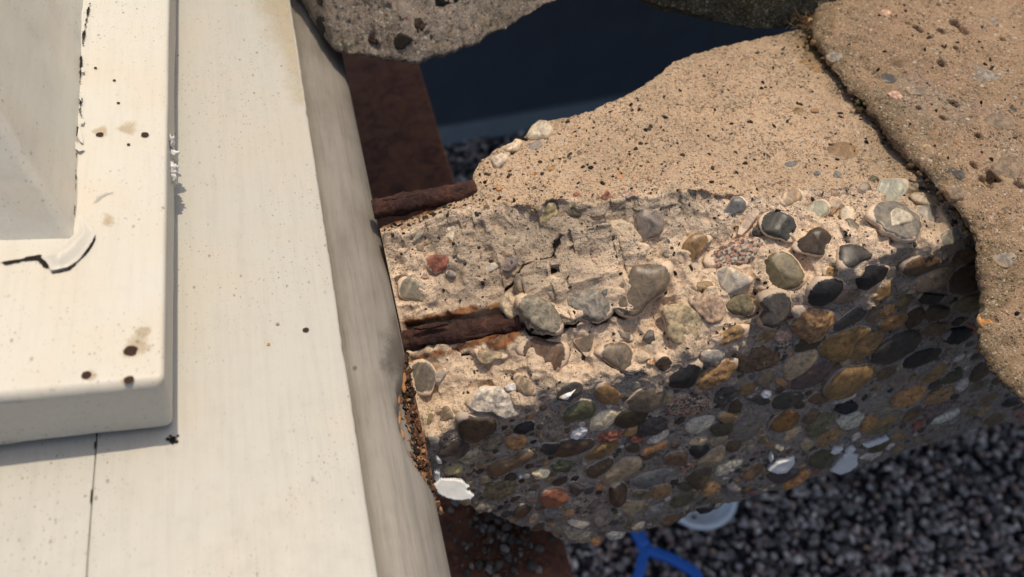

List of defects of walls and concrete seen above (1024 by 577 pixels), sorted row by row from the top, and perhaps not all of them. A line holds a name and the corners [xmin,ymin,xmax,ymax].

crack [785,6,969,234]
peeling [41,214,95,273]
corrosion [404,303,500,328]
corrosion [409,325,525,361]
spalling [382,182,954,414]
peeling [433,455,474,501]